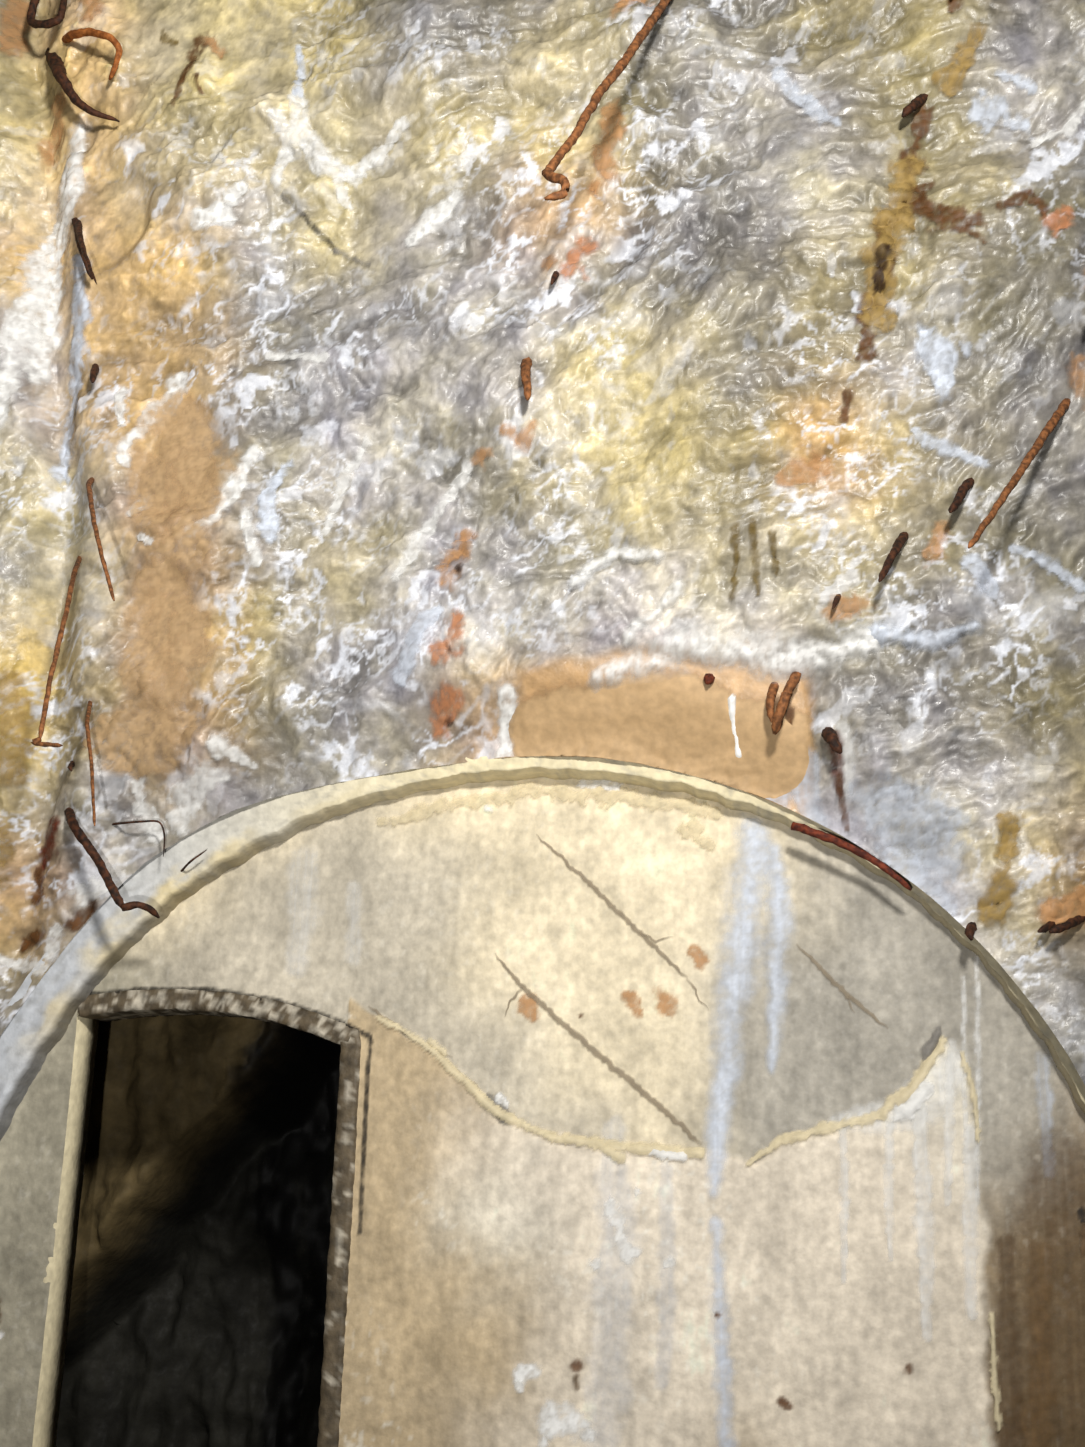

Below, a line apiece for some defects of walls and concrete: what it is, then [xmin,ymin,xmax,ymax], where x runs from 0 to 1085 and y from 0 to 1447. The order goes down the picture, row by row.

corrosion [83,393,234,775]
corrosion [20,929,43,952]
corrosion [32,816,60,904]
corrosion [65,900,96,931]
peeling [377,1016,705,1163]
crack [498,959,696,1140]
crack [540,839,704,1004]
corrosion [623,991,674,1015]
damp [709,820,791,1194]
peeling [746,1026,981,1165]
damp [711,1219,733,1447]
peeling [989,1313,1002,1431]